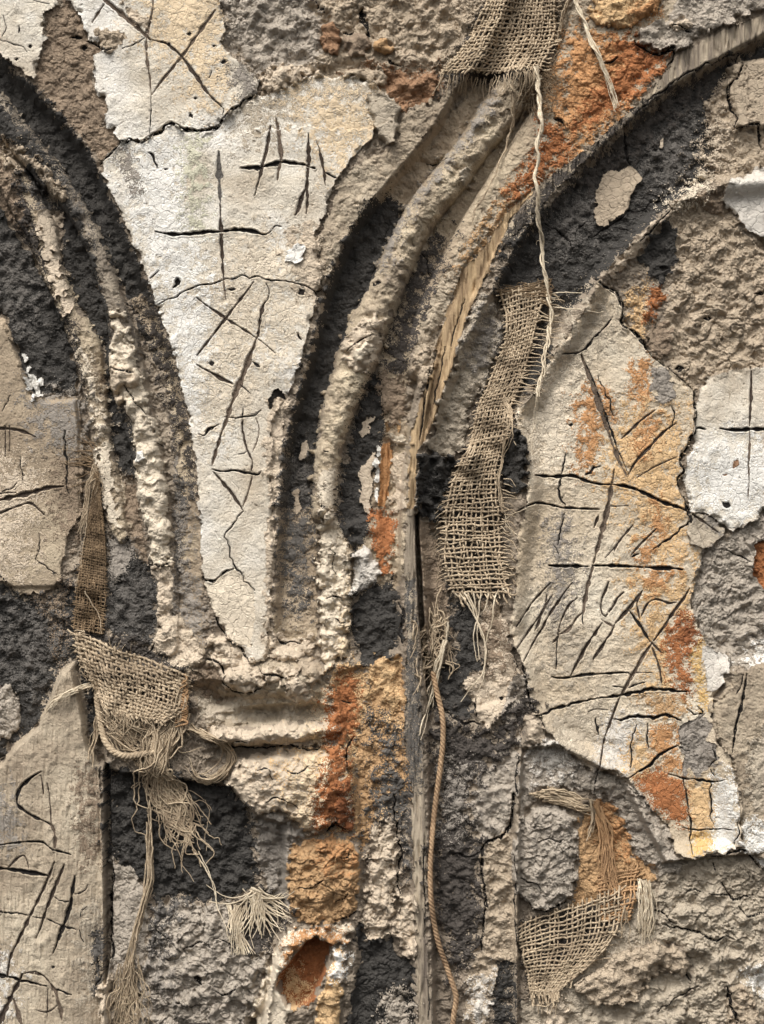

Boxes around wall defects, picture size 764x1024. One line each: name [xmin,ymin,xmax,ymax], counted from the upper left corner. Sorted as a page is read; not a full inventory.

crack [100,96,254,165]
crack [159,275,322,304]
corrosion [443,0,672,306]
crack [553,454,601,554]
peeling [594,166,642,226]
crack [562,279,706,557]
corrosion [561,275,719,858]
spalling [608,55,764,404]
corrosion [247,561,371,898]
crack [513,660,764,918]
crack [0,973,72,995]
corrosion [276,922,351,1013]